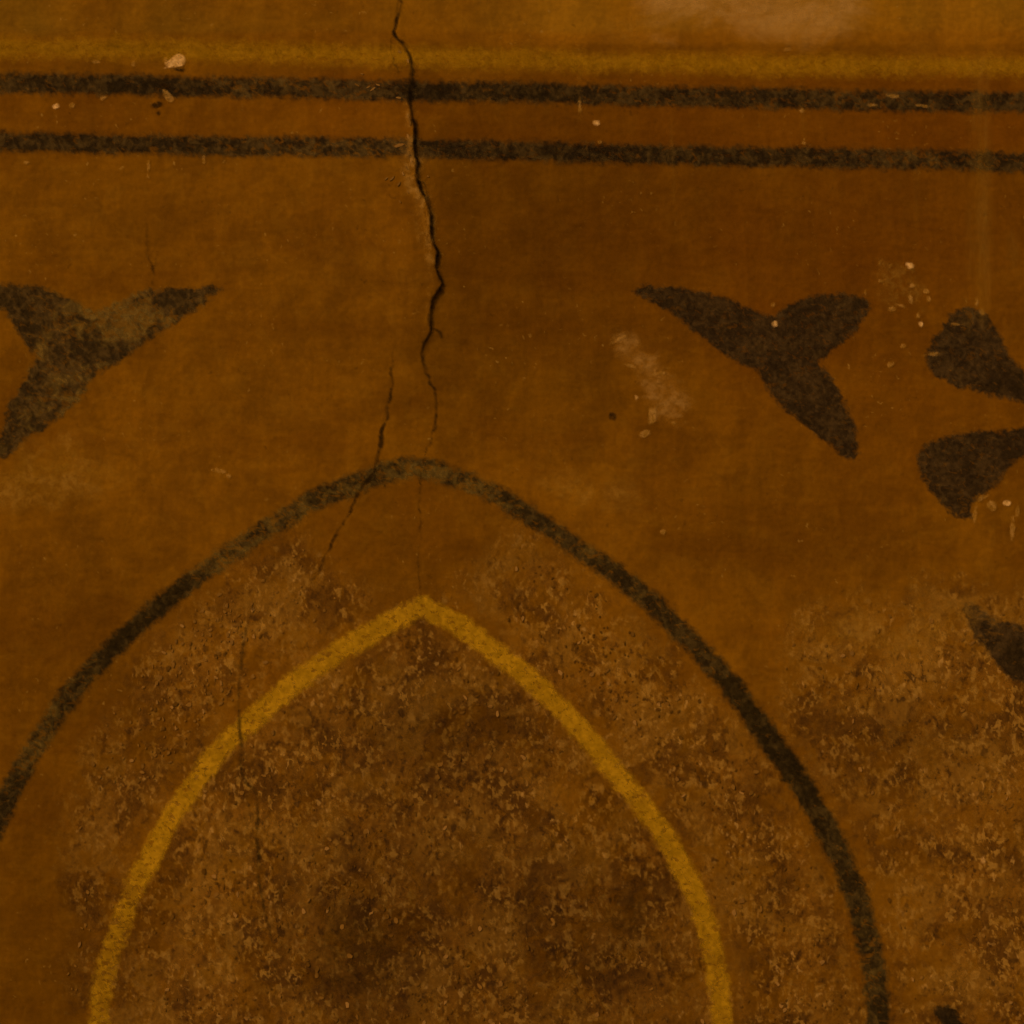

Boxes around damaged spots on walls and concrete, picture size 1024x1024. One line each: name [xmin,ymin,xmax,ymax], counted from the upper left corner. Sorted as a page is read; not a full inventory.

crack [355,0,443,292]
crack [329,389,391,550]